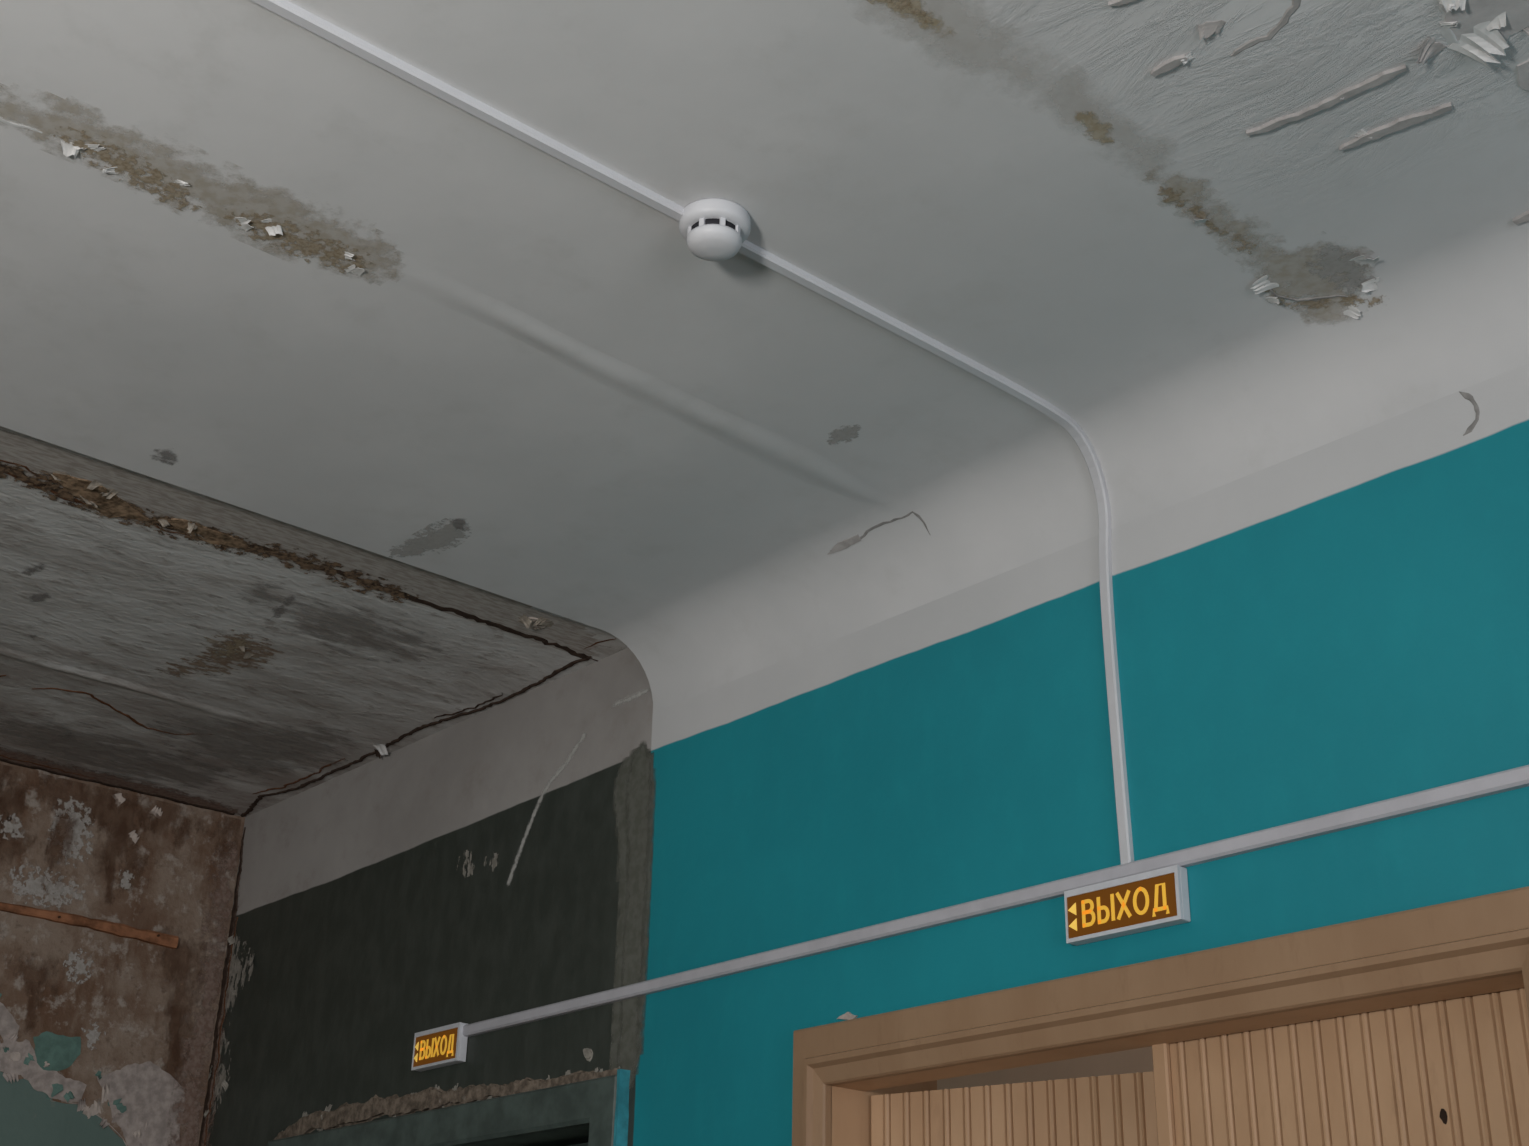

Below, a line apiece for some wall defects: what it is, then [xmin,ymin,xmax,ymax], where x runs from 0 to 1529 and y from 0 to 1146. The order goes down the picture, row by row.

damp [868,0,951,33]
peeling [1416,0,1529,69]
damp [1075,111,1114,143]
damp [0,94,398,279]
damp [1147,174,1382,321]
damp [153,450,176,465]
damp [389,519,469,558]
damp [247,585,438,661]
damp [0,718,349,788]
crack [0,459,614,1146]
peeling [0,761,254,1146]
flaking render [274,1048,621,1140]